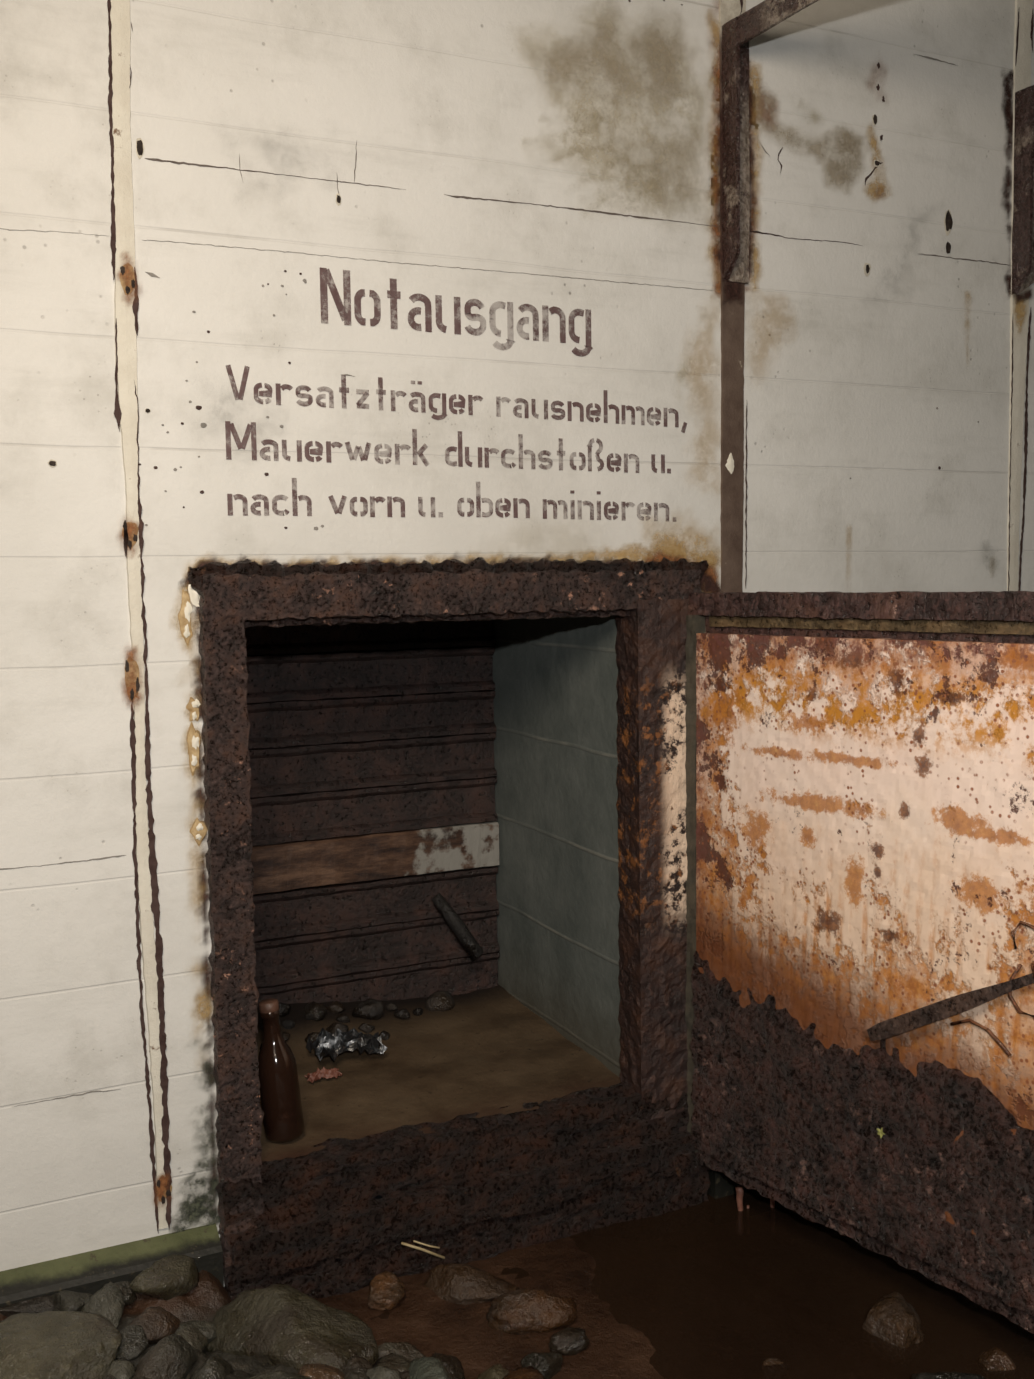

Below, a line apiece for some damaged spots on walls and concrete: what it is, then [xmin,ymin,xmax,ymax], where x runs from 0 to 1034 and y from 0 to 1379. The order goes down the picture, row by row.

rust [710,21,760,301]
rust [868,180,885,198]
rust [1003,72,1014,232]
rust [1005,275,1032,326]
rust [183,534,721,593]
rust [193,607,203,718]
rust [195,737,209,940]
rust [201,957,219,1215]
rust [690,951,1034,1316]